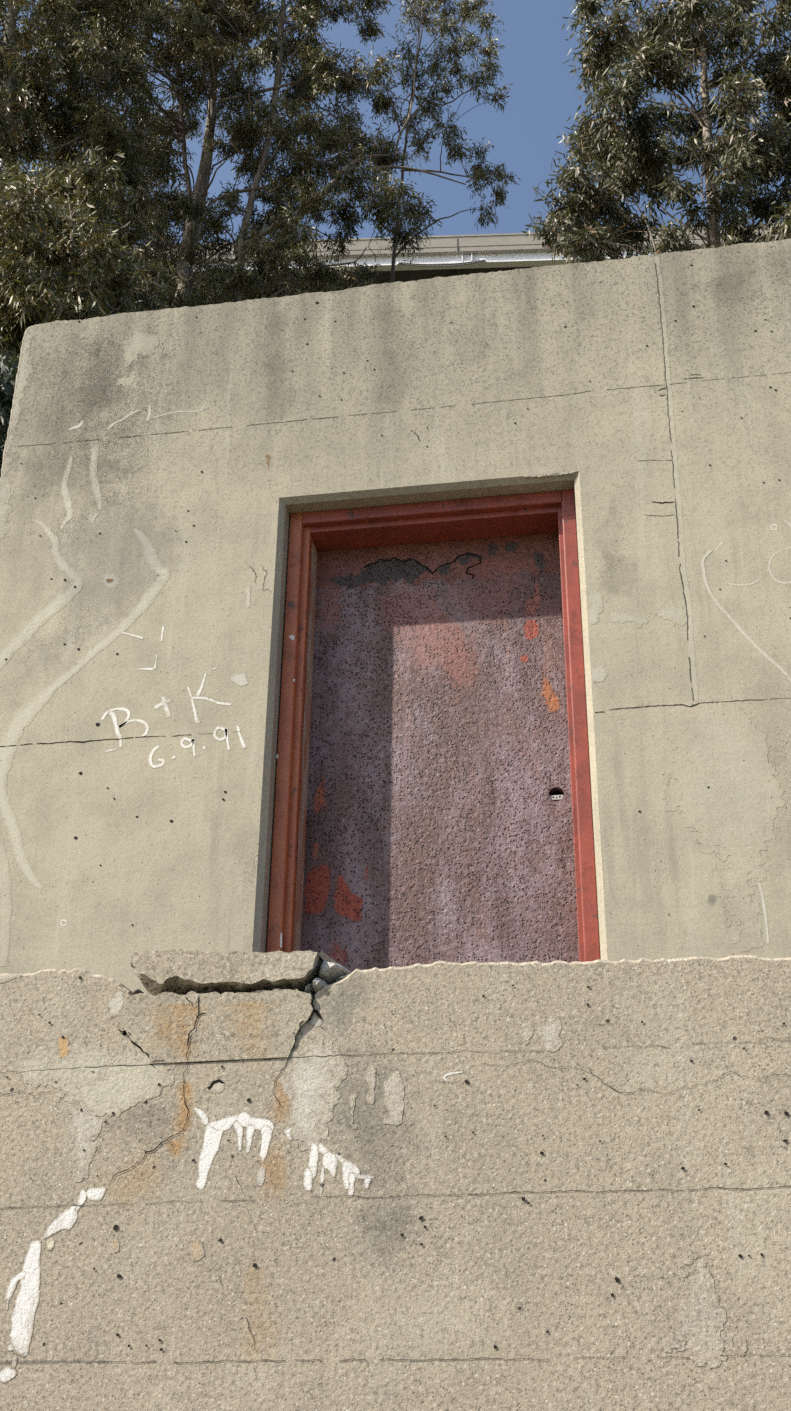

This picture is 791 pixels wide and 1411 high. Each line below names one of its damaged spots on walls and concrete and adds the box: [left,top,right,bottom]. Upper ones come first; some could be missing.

rust [366,549,543,704]
crack [108,997,206,1185]
crack [272,990,326,1107]